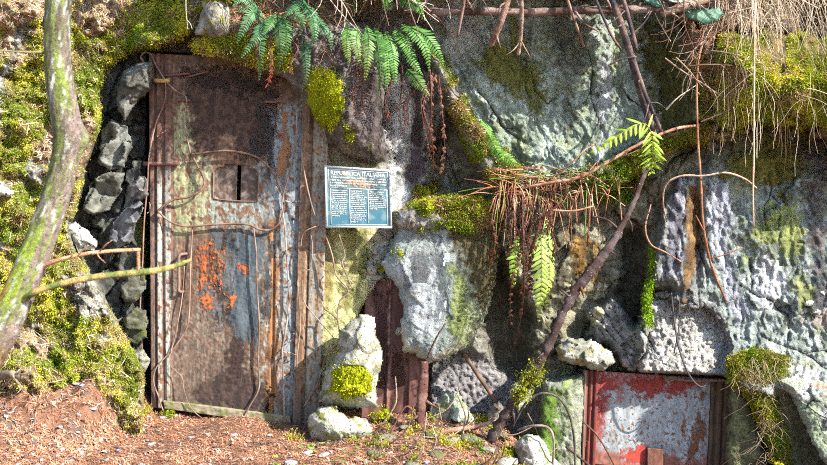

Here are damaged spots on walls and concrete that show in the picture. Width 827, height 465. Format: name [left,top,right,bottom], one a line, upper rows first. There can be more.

corrosion [179,64,290,180]
corrosion [268,218,281,244]
corrosion [193,254,281,413]
peeling [620,445,646,465]
corrosion [681,391,707,465]